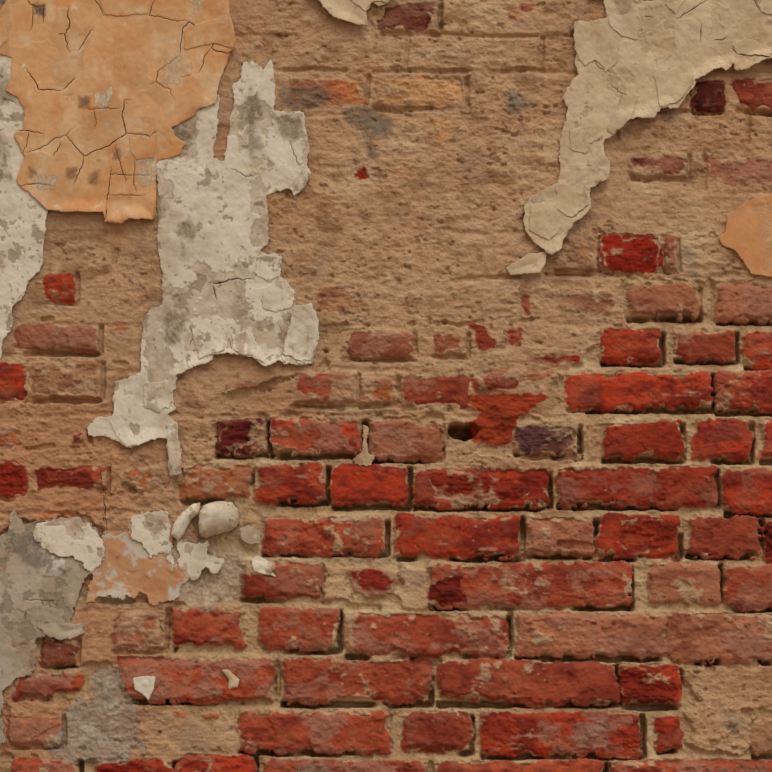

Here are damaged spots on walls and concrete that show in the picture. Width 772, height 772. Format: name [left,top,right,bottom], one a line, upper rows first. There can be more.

crack [60,8,91,49]
crack [149,0,231,96]
flaking render [318,0,390,26]
crack [27,71,75,91]
crack [0,99,155,219]
flaking render [506,0,772,278]
flaking render [0,0,319,477]
flaking render [240,525,260,545]
flaking render [251,556,276,577]
flaking render [0,509,224,745]
flaking render [222,669,240,689]